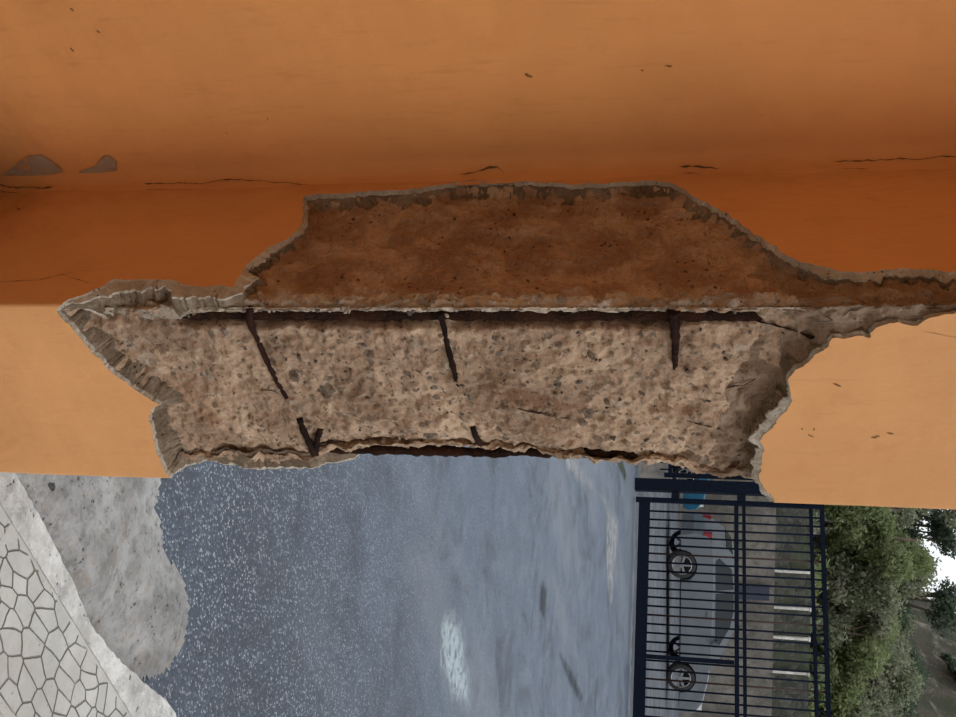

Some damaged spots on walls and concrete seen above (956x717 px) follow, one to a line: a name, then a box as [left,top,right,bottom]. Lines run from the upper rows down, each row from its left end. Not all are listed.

peeling [5,155,63,176]
peeling [80,155,117,173]
crack [836,155,954,170]
spalling [56,180,956,502]